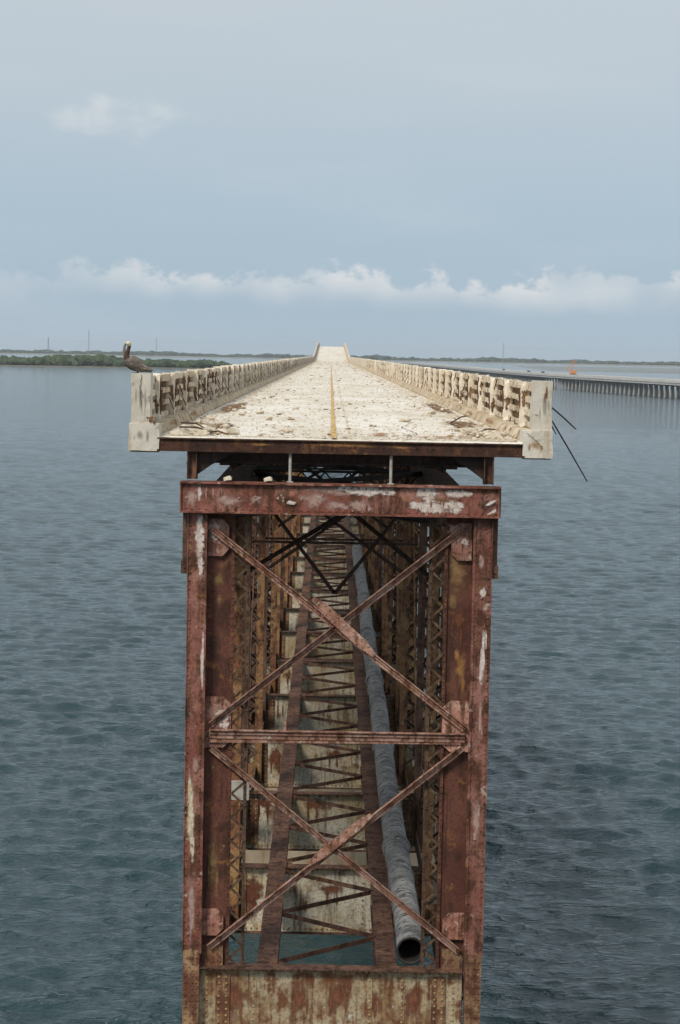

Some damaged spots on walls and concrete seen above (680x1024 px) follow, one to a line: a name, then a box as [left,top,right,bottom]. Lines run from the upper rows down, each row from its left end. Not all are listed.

peeling [185,484,262,575]
peeling [410,485,473,545]
corrosion [449,555,466,607]
corrosion [455,651,464,689]
corrosion [258,799,272,820]
corrosion [208,844,219,897]
corrosion [246,878,263,910]
corrosion [319,886,342,905]
corrosion [293,987,308,1015]
corrosion [329,986,347,1014]
corrosion [406,988,420,1017]